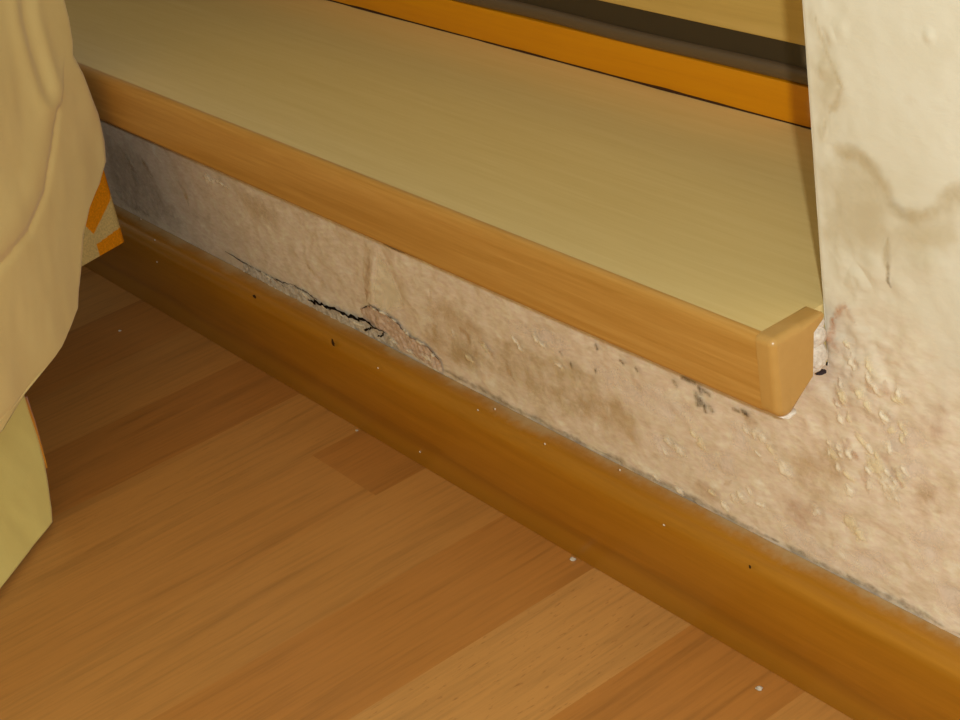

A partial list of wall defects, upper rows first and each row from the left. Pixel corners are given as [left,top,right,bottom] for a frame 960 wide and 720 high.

crack [225,251,385,337]
flaking render [243,263,443,373]